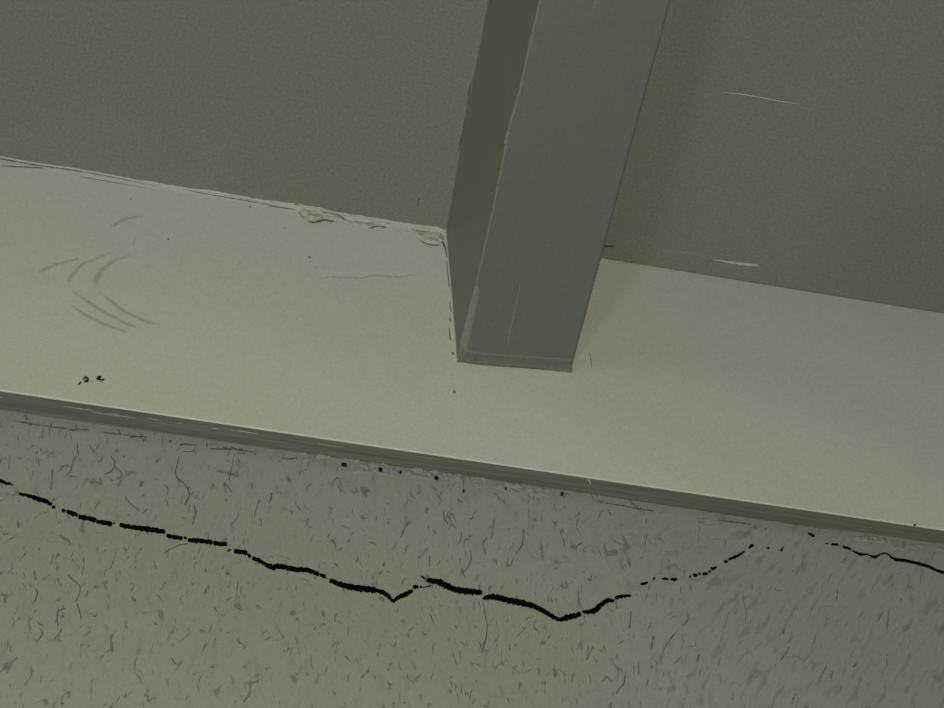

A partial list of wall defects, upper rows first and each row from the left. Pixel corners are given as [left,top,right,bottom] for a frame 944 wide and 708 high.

crack [0,420,944,657]